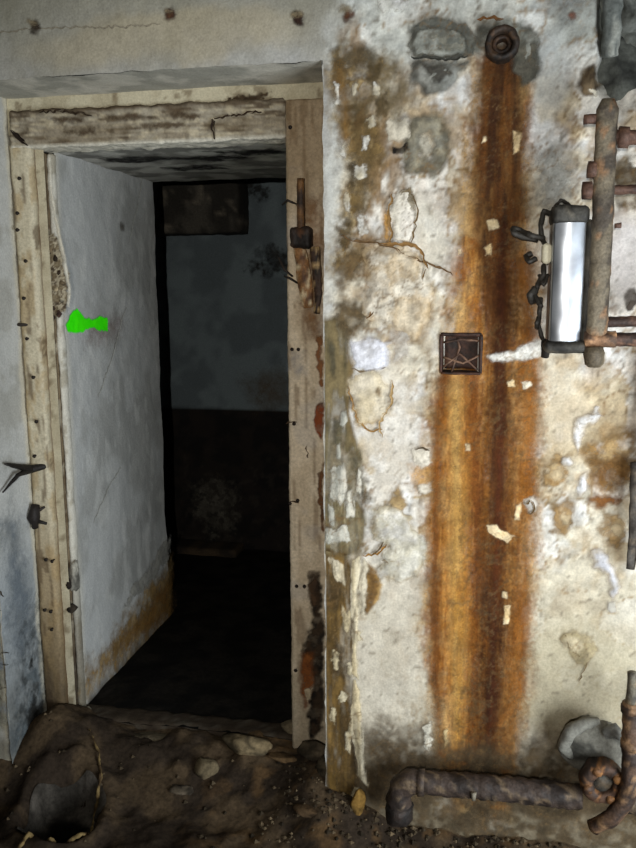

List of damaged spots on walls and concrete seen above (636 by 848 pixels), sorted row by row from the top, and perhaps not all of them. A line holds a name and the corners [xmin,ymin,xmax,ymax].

crack [0,23,159,33]
spalling [228,92,268,100]
spalling [577,64,600,96]
spalling [54,117,94,135]
spalling [122,113,199,129]
corrosion [424,55,539,776]
peeling [314,318,426,816]
corrosion [300,653,314,707]